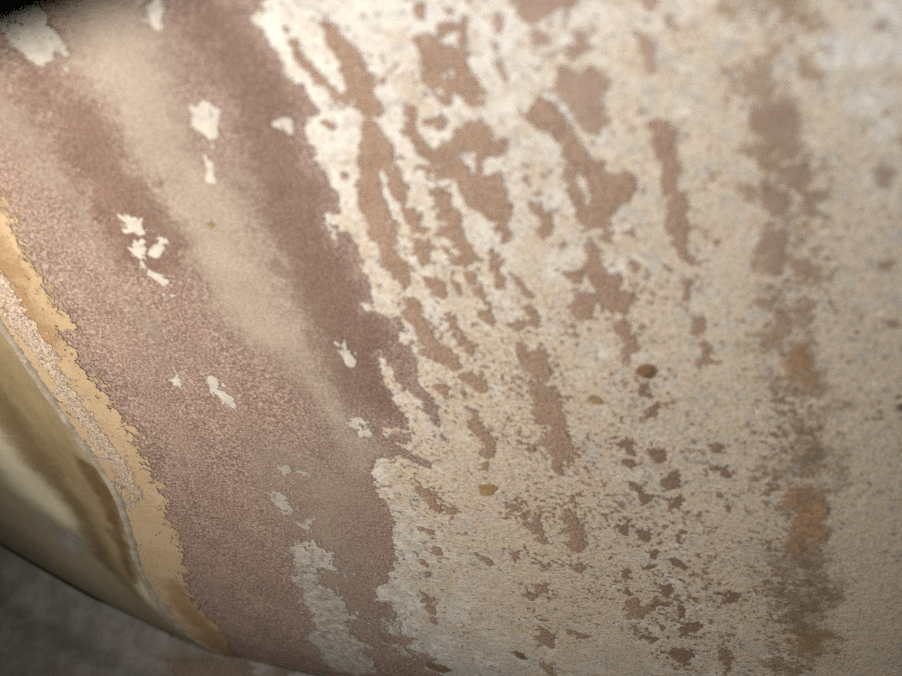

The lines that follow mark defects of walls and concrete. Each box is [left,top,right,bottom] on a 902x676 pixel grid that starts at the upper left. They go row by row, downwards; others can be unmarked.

peeling [141,0,164,31]
peeling [10,36,69,72]
peeling [188,100,223,186]
peeling [272,112,294,134]
peeling [112,214,175,297]
peeling [334,340,361,373]
rust [720,34,852,676]
peeling [202,371,240,412]
peeling [340,417,379,439]
peeling [264,463,432,676]